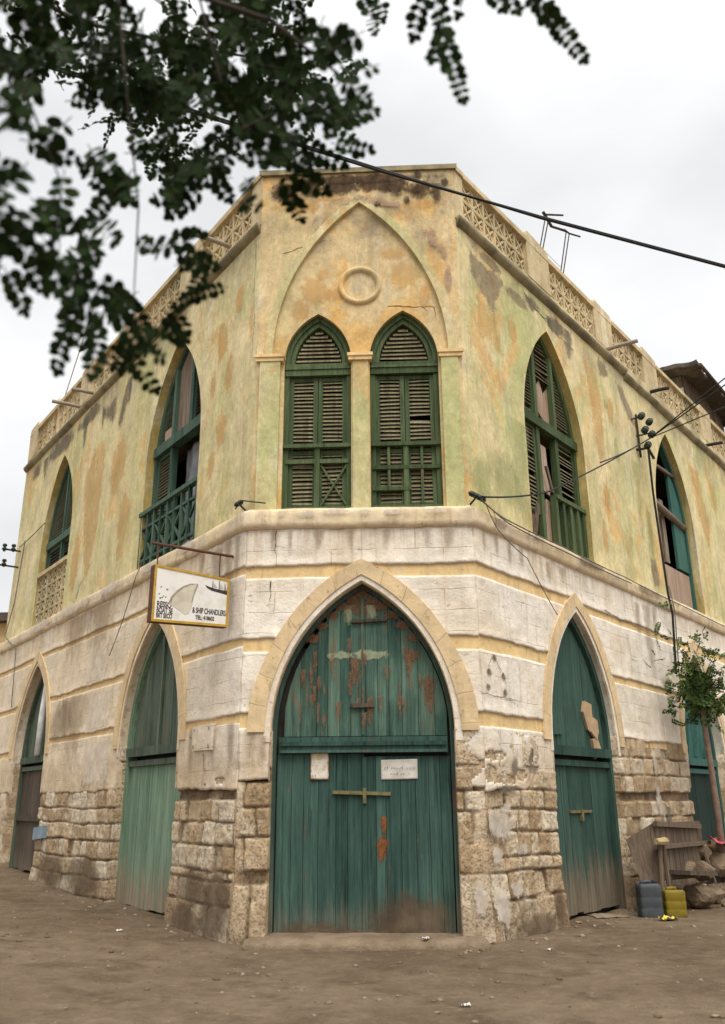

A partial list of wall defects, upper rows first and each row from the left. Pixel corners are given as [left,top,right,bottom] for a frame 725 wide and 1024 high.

leakage [272,174,440,202]
flaking render [458,750,527,785]
corrosion [377,816,389,862]
peeling [493,848,503,863]
peeling [474,879,488,916]
peeling [511,881,523,899]